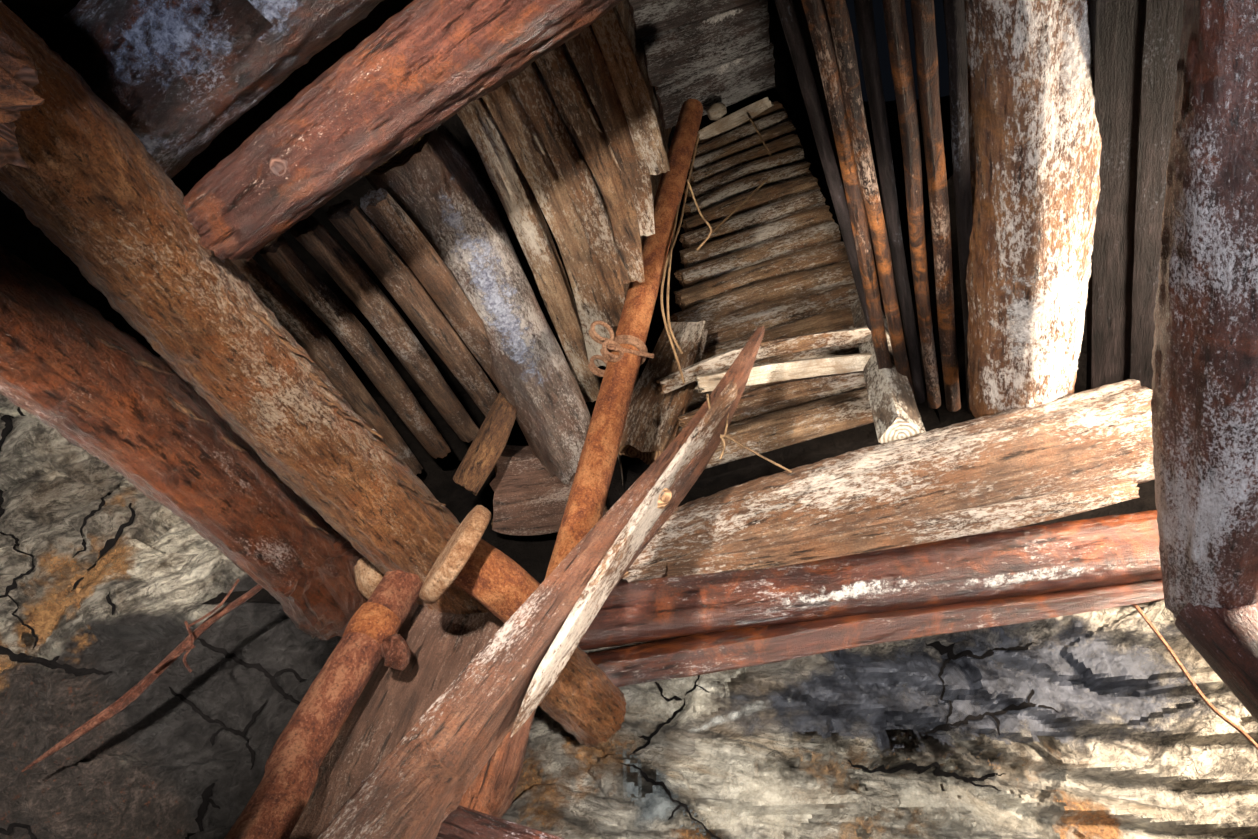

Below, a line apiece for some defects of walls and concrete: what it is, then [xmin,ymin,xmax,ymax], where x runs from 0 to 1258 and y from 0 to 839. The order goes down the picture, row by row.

crack [0,407,26,451]
crack [0,489,112,677]
rust [18,539,130,645]
crack [71,485,136,615]
crack [169,638,307,770]
crack [848,641,1059,791]
crack [0,823,37,839]
crack [185,783,220,839]